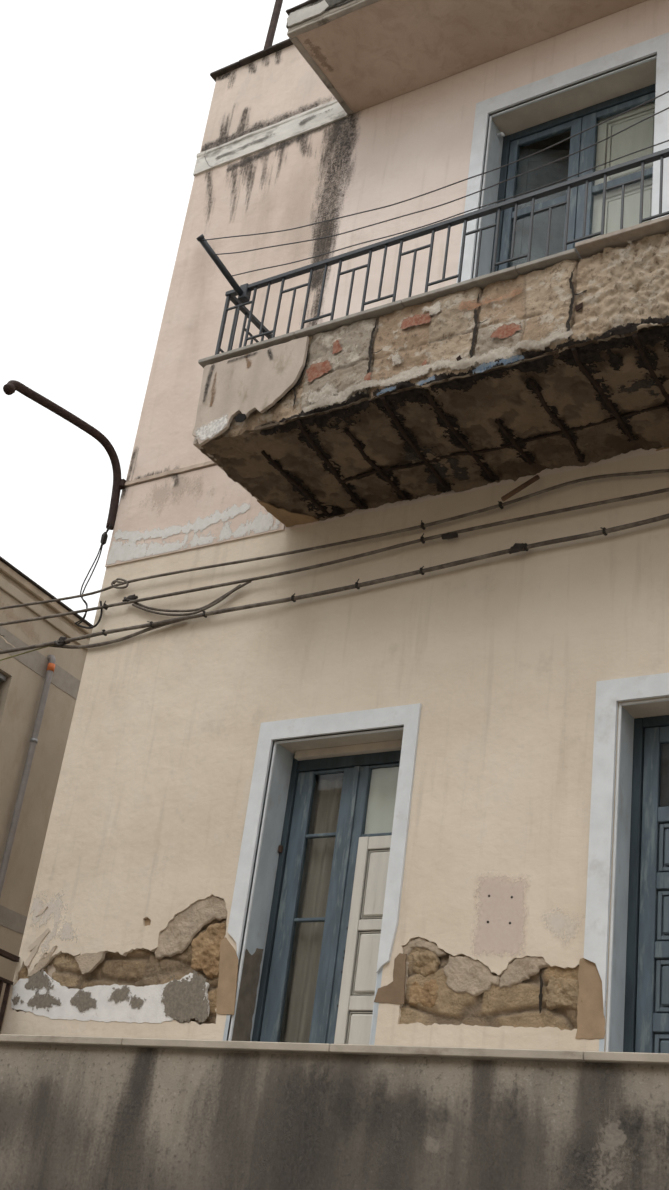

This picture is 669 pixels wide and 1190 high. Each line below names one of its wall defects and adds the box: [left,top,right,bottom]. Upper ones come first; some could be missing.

water stain [201,101,359,327]
spalling [106,231,669,565]
flaking render [11,893,263,1041]
flaking render [374,937,606,1039]
water stain [104,1048,154,1189]
water stain [249,1057,448,1190]
water stain [472,1060,524,1171]
water stain [563,1062,669,1190]